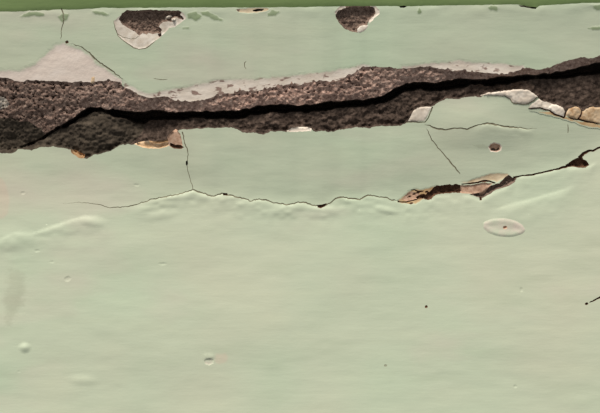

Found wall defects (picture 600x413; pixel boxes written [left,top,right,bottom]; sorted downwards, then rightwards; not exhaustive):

spalling [114,9,186,50]
spalling [335,6,380,33]
peeling [0,41,373,102]
peeling [399,58,528,74]
crack [0,8,600,208]
peeling [408,107,431,122]
peeling [479,89,600,129]
peeling [488,142,502,152]